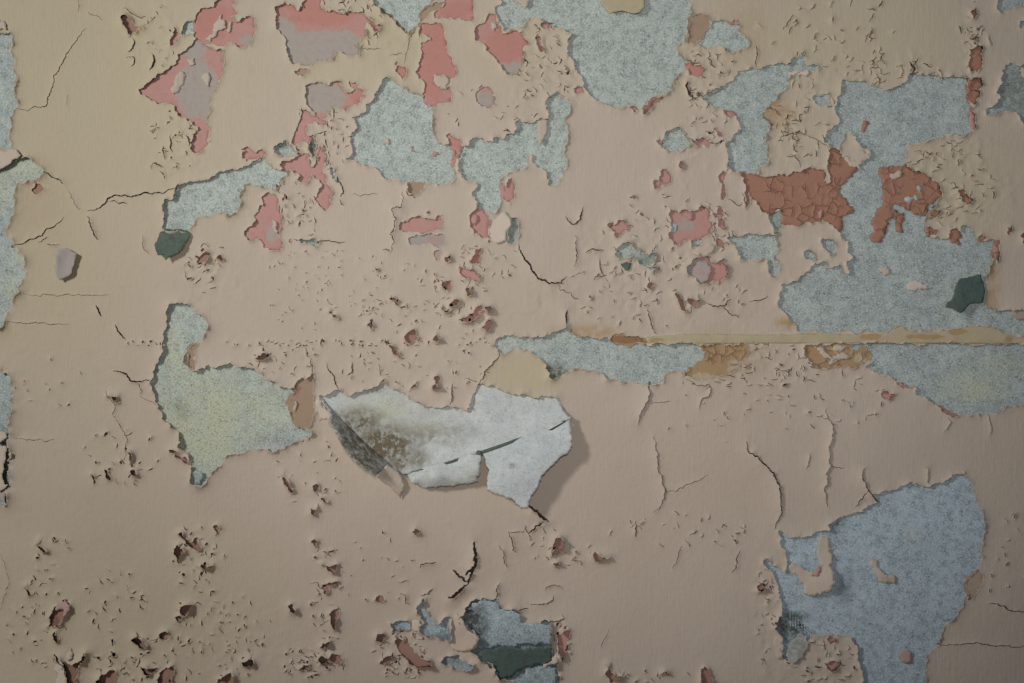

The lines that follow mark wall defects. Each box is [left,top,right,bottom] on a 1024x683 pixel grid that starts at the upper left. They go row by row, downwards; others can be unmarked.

crack [16,6,103,111]
peeling [0,21,44,328]
crack [11,127,191,248]
peeling [122,0,1024,508]
peeling [84,432,158,486]
crack [639,381,709,509]
crack [747,444,782,523]
crack [808,422,878,507]
crack [401,505,564,623]
peeling [757,474,992,683]
peeling [376,598,571,683]